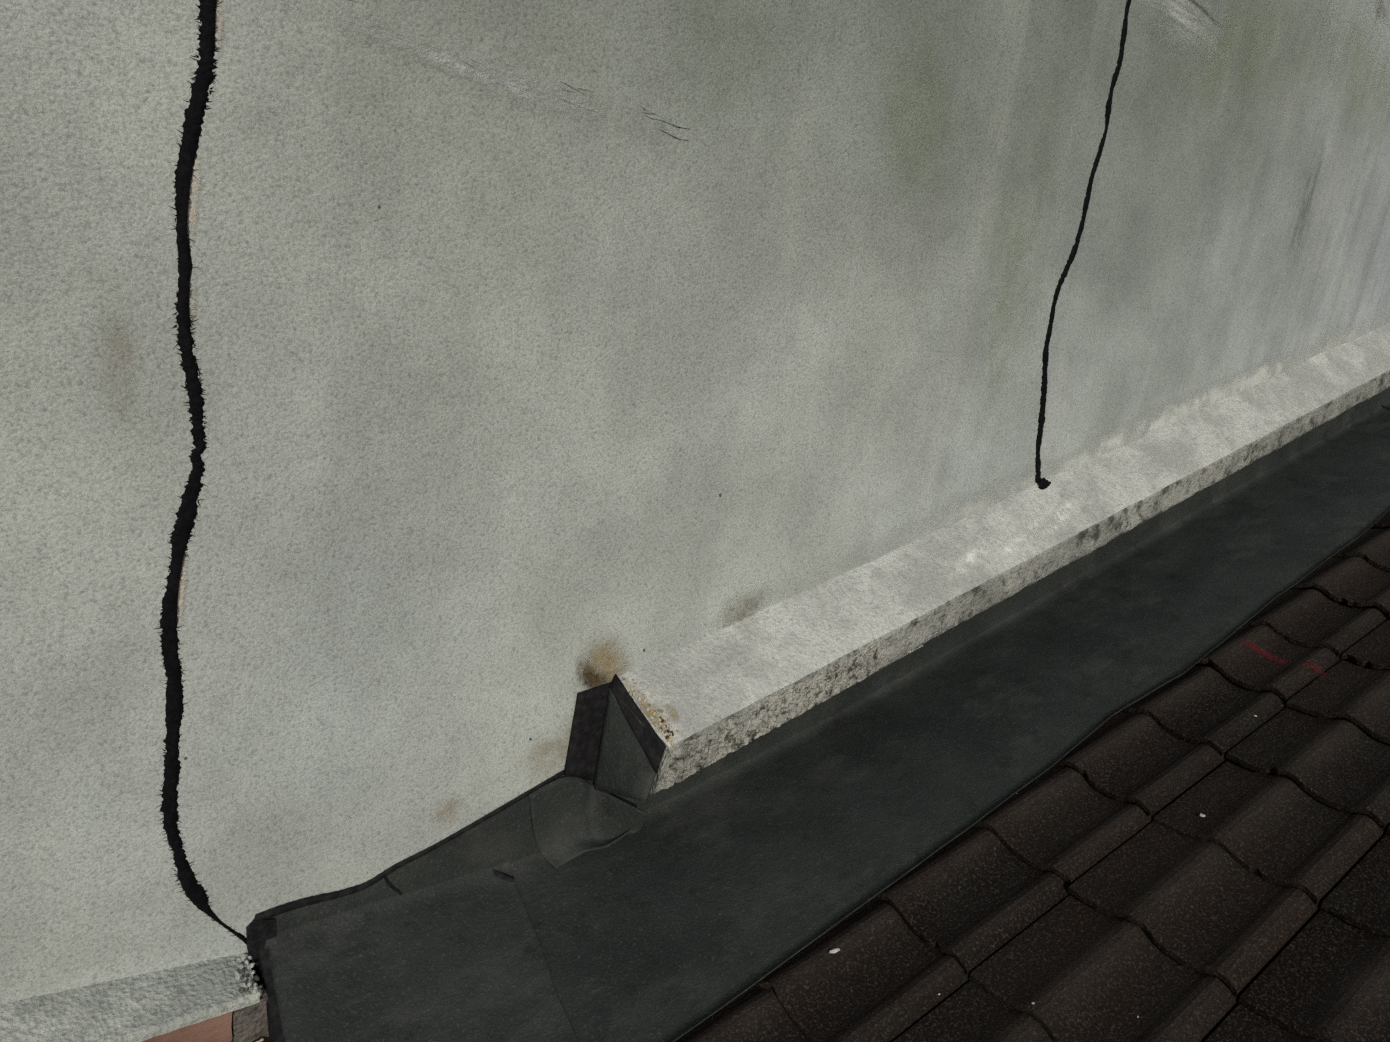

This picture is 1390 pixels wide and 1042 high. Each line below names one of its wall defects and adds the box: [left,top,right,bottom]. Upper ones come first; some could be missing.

crack [155,0,247,945]
rust [583,648,618,688]
crack [1035,0,1131,490]